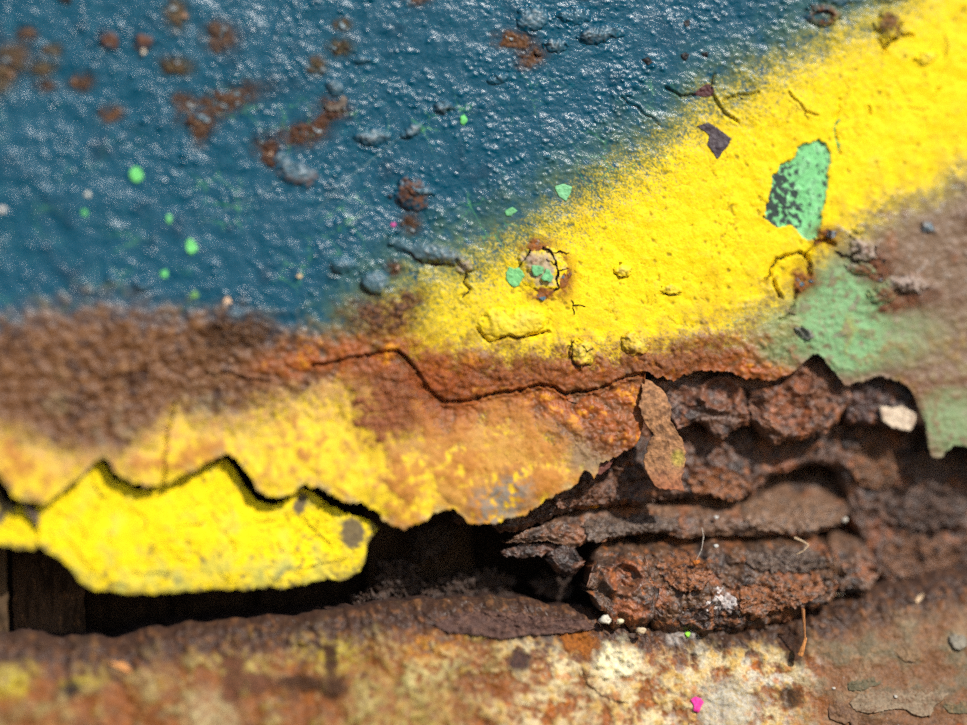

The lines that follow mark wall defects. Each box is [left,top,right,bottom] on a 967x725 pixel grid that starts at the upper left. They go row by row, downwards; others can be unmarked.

crack [763,237,832,320]
rust [352,351,462,450]
crack [312,351,643,404]
peeling [879,406,917,431]
peeling [596,459,614,475]
rust [552,472,679,543]
rust [847,441,967,579]
peeling [499,542,585,577]
rust [678,470,846,632]
peeling [433,610,596,639]
rust [778,623,808,664]
rust [221,644,345,702]